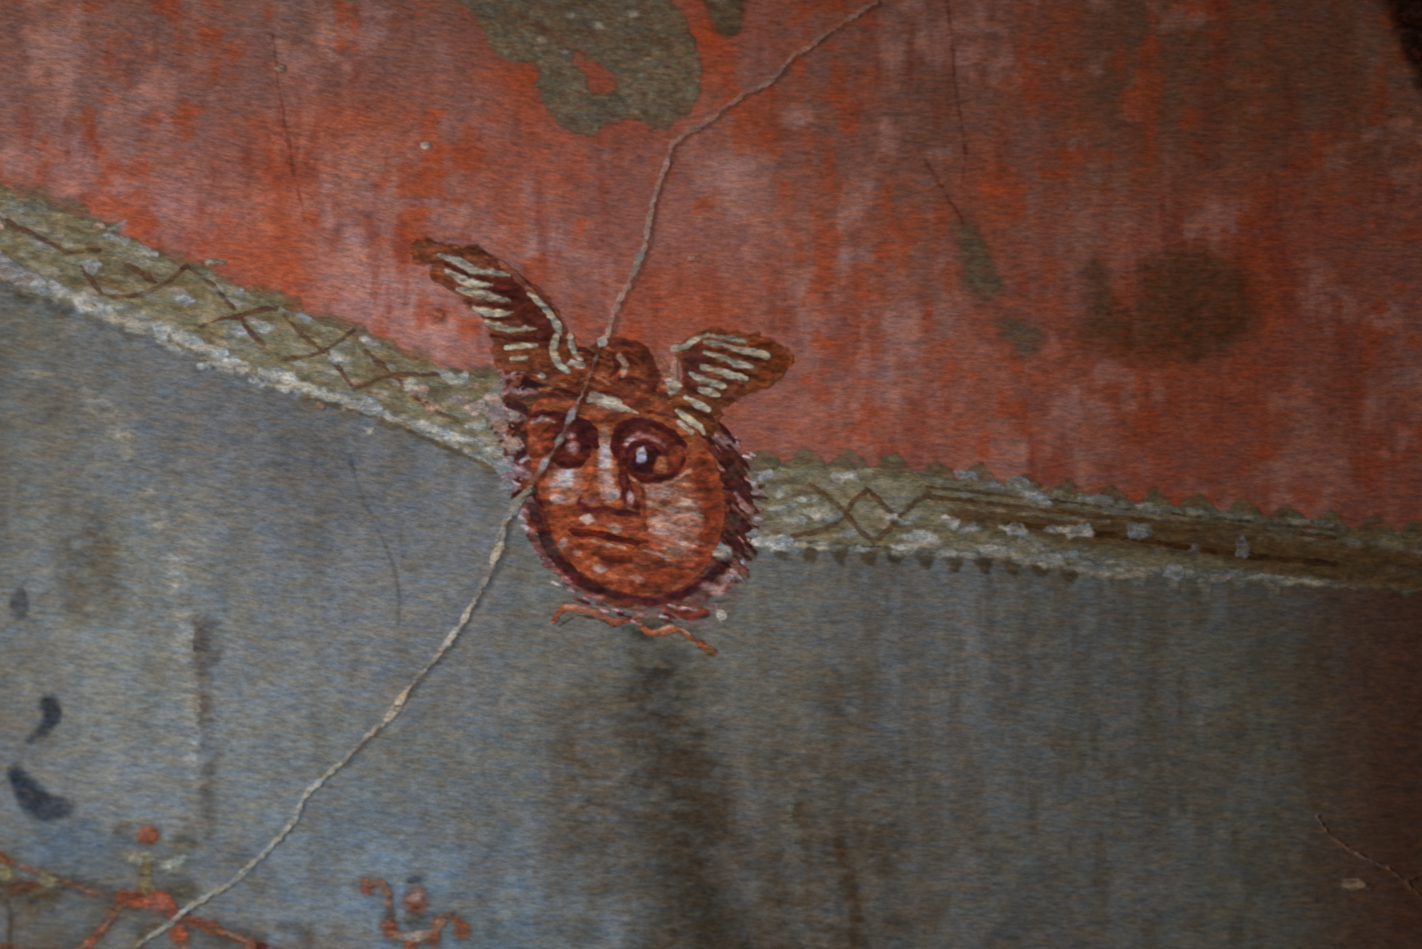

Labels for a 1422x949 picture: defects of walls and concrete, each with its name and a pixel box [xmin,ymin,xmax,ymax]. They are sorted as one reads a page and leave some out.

peeling [457,0,701,136]
peeling [704,0,743,36]
crack [137,0,878,946]